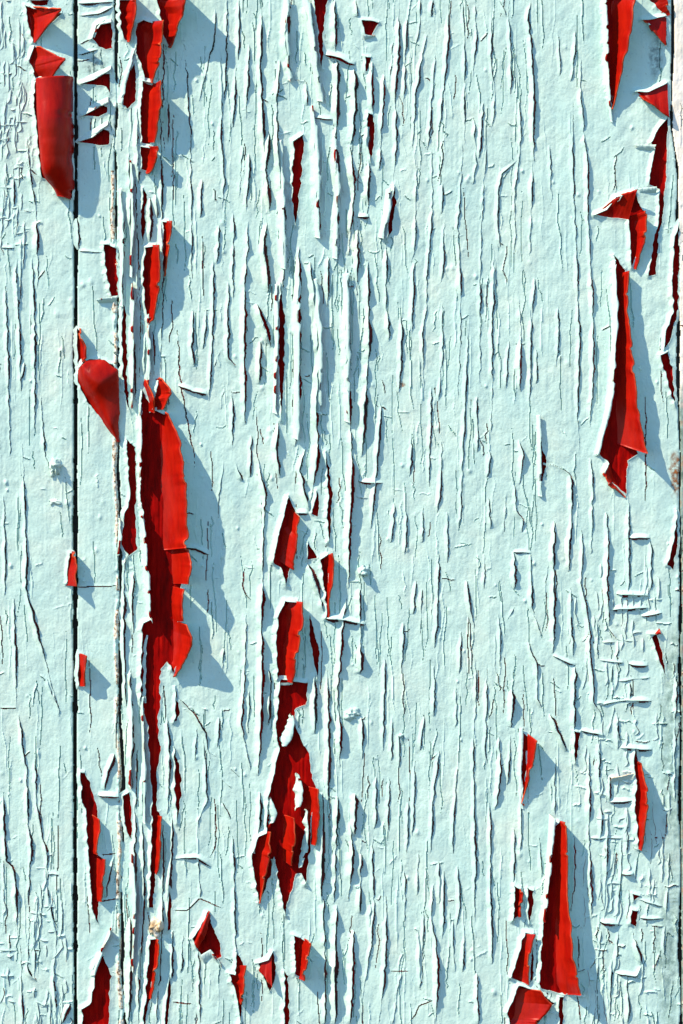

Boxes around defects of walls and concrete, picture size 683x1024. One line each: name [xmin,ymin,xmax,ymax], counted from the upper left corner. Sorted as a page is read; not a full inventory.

crack [0,0,71,1024]
crack [73,219,101,253]
crack [78,0,113,55]
peeling [23,0,193,1024]
crack [79,557,237,1024]
peeling [188,910,312,1024]
peeling [248,452,335,916]
crack [119,0,552,1024]
peeling [504,814,581,1024]
crack [509,31,678,1024]
peeling [601,0,671,122]
peeling [594,81,681,497]